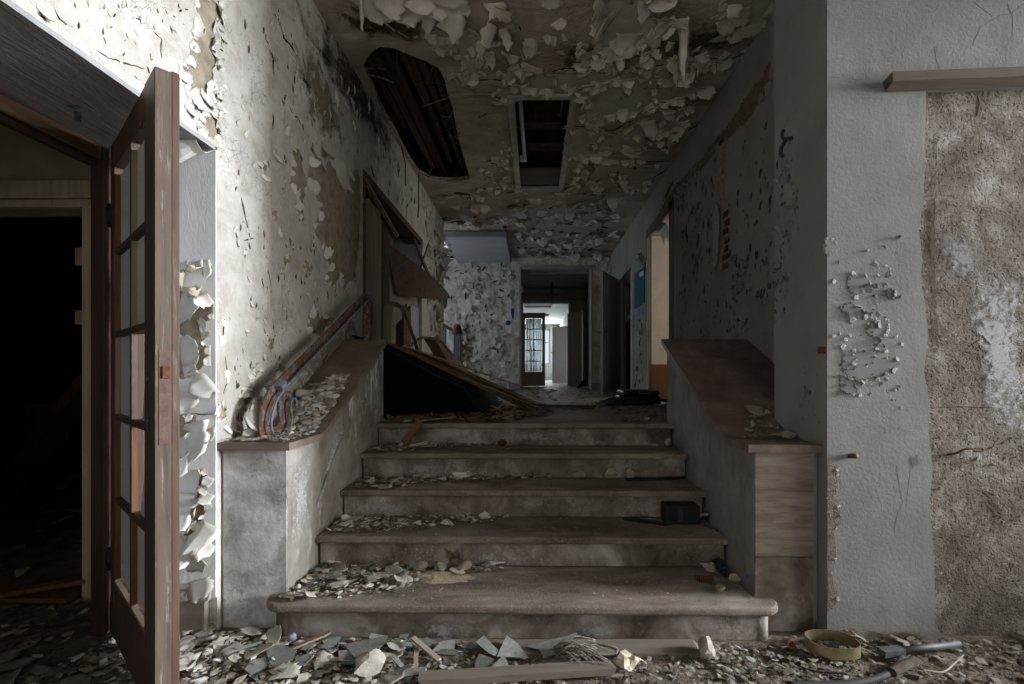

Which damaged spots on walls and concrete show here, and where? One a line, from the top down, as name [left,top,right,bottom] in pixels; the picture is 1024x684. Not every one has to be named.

peeling [78,0,255,163]
peeling [180,14,371,603]
peeling [349,0,774,389]
flaking render [823,237,839,265]
peeling [832,235,904,410]